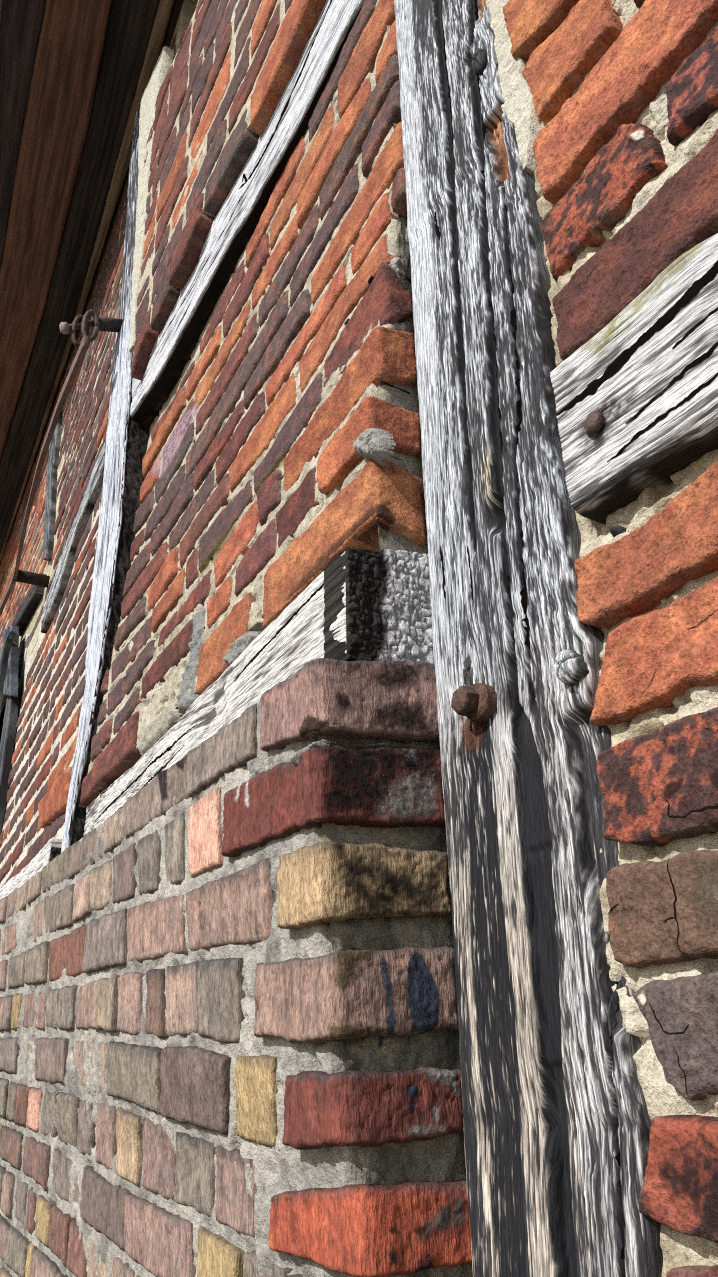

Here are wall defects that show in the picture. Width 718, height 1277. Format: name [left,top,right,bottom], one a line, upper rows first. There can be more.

crack [441,0,486,175]
crack [434,211,459,243]
crack [556,260,718,462]
crack [463,268,531,672]
corrosion [459,715,483,750]
crack [663,860,699,960]